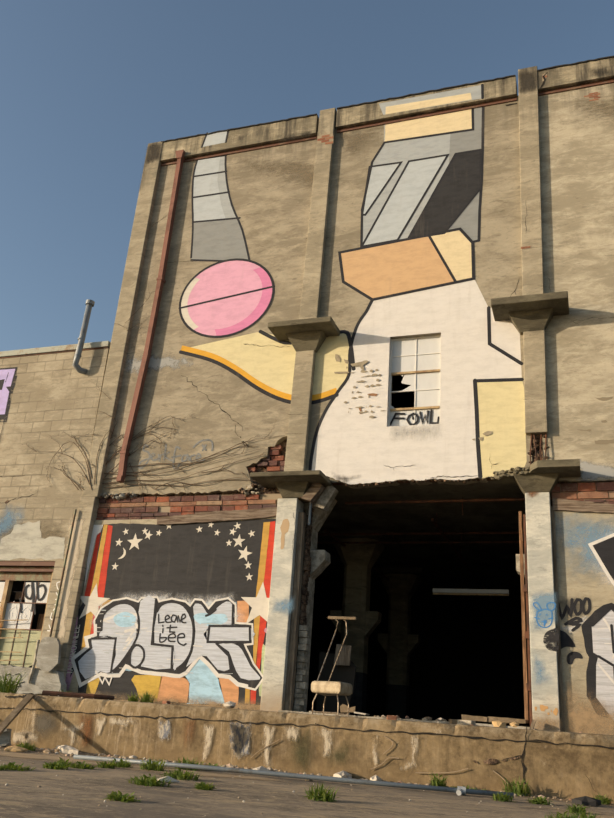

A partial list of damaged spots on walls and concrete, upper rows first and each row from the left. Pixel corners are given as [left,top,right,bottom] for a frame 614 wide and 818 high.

peeling [334,354,386,418]
spalling [239,439,287,497]
crack [0,694,614,795]